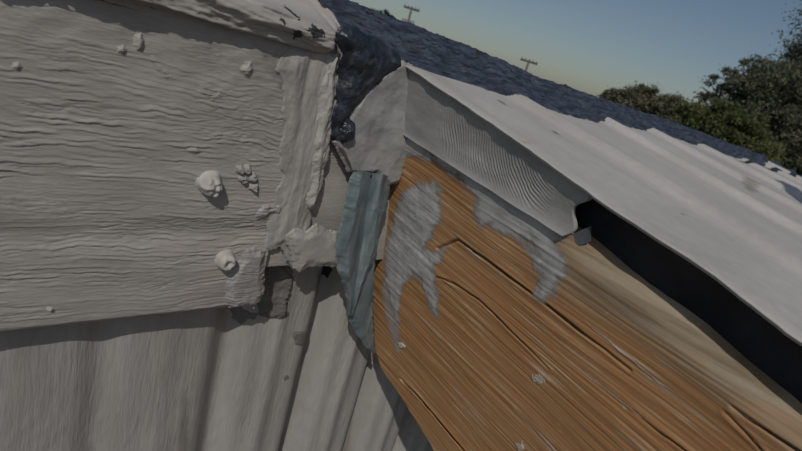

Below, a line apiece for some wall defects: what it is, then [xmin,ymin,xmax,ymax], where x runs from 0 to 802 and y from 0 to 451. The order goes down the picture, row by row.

spalling [291,23,325,40]
peeling [305,52,341,209]
peeling [285,223,338,273]
crack [436,240,620,365]
crack [409,387,465,451]